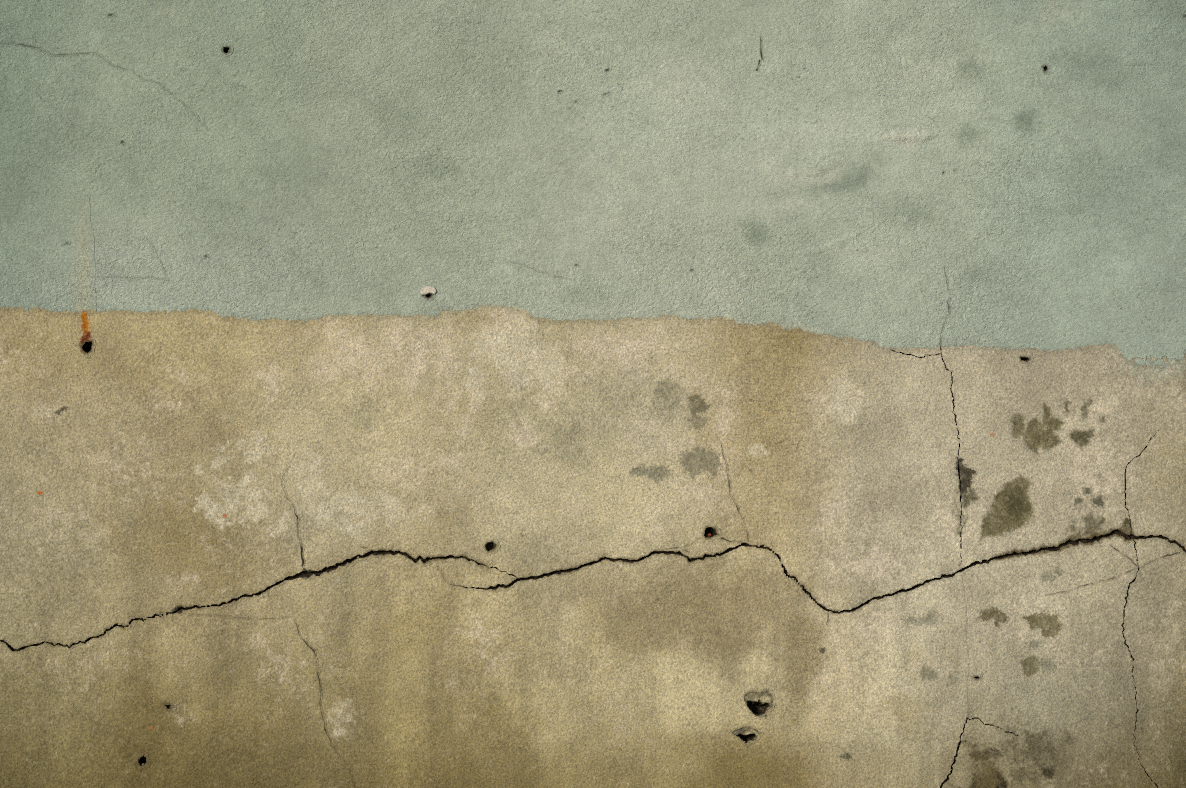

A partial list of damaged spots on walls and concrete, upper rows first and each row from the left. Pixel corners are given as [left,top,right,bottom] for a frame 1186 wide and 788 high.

crack [0,40,209,130]
peeling [419,285,436,295]
crack [0,266,1186,788]
flaking render [0,304,1186,788]
damp [597,314,871,788]
damp [949,481,982,544]
mould [1061,509,1115,543]